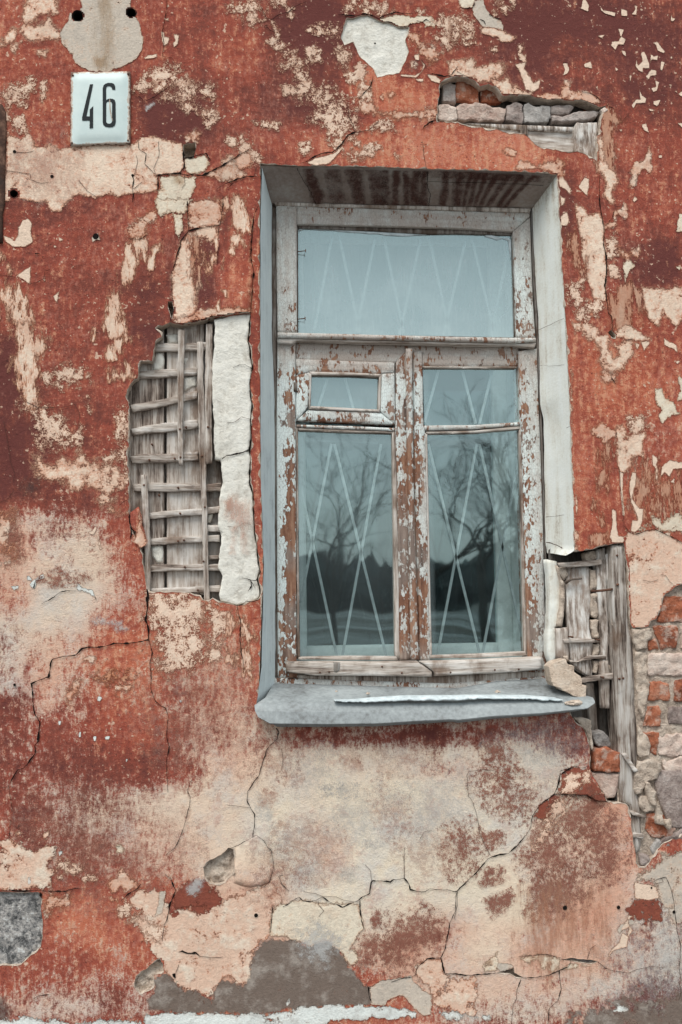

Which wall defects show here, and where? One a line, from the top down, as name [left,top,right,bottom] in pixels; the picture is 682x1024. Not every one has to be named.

peeling [0,0,682,693]
crack [599,180,637,340]
crack [2,589,220,978]
peeling [0,712,682,1024]
crack [228,728,624,1002]
crack [511,946,654,1024]
crack [655,877,682,999]